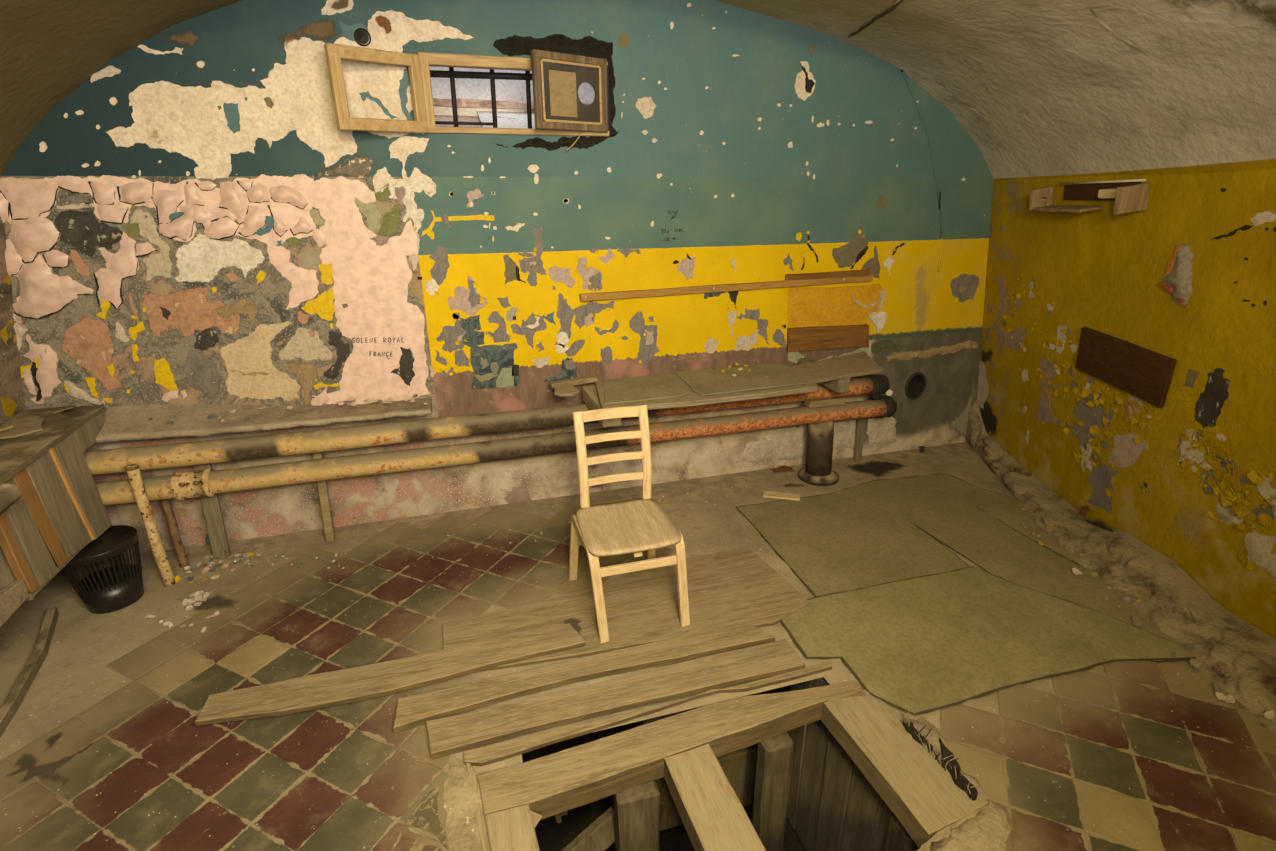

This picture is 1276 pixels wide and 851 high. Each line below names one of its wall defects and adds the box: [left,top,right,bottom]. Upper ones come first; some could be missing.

peeling [1,0,660,422]
peeling [673,254,696,280]
flaking render [704,221,979,363]
flaking render [735,425,807,464]
flaking render [833,417,897,450]
spalling [964,275,1276,736]
spalling [522,677,830,763]
spalling [534,777,695,851]
spalling [716,711,988,851]